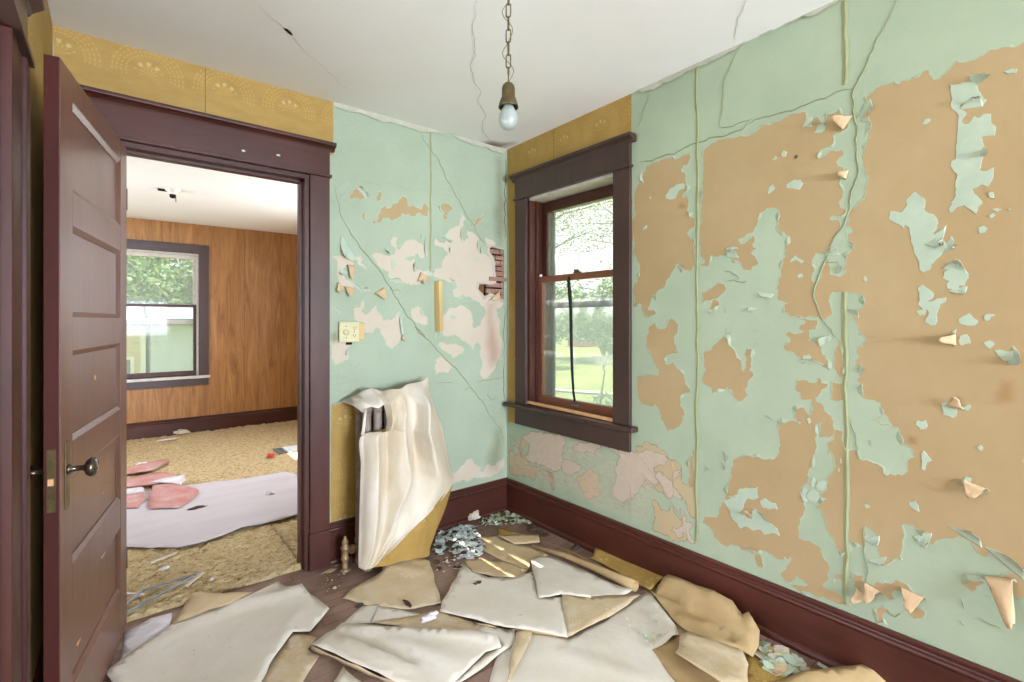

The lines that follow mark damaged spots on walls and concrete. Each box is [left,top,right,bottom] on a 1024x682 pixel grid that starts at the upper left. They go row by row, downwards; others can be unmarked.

peeling [330,186,507,379]
crack [334,187,506,445]
crack [421,1,507,247]
peeling [452,41,1024,630]
crack [639,0,898,337]